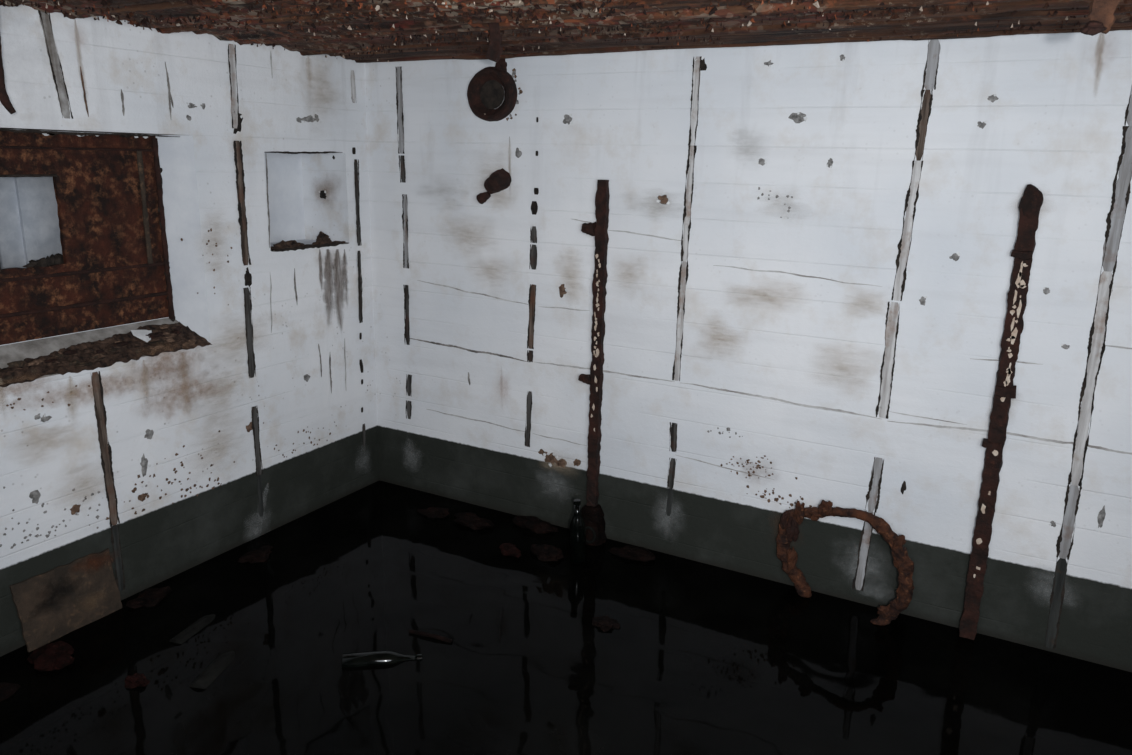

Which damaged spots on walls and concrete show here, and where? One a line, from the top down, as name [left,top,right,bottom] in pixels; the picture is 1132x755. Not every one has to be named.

corrosion [0,0,1089,121]
damp [319,249,347,324]
corrosion [720,455,773,478]